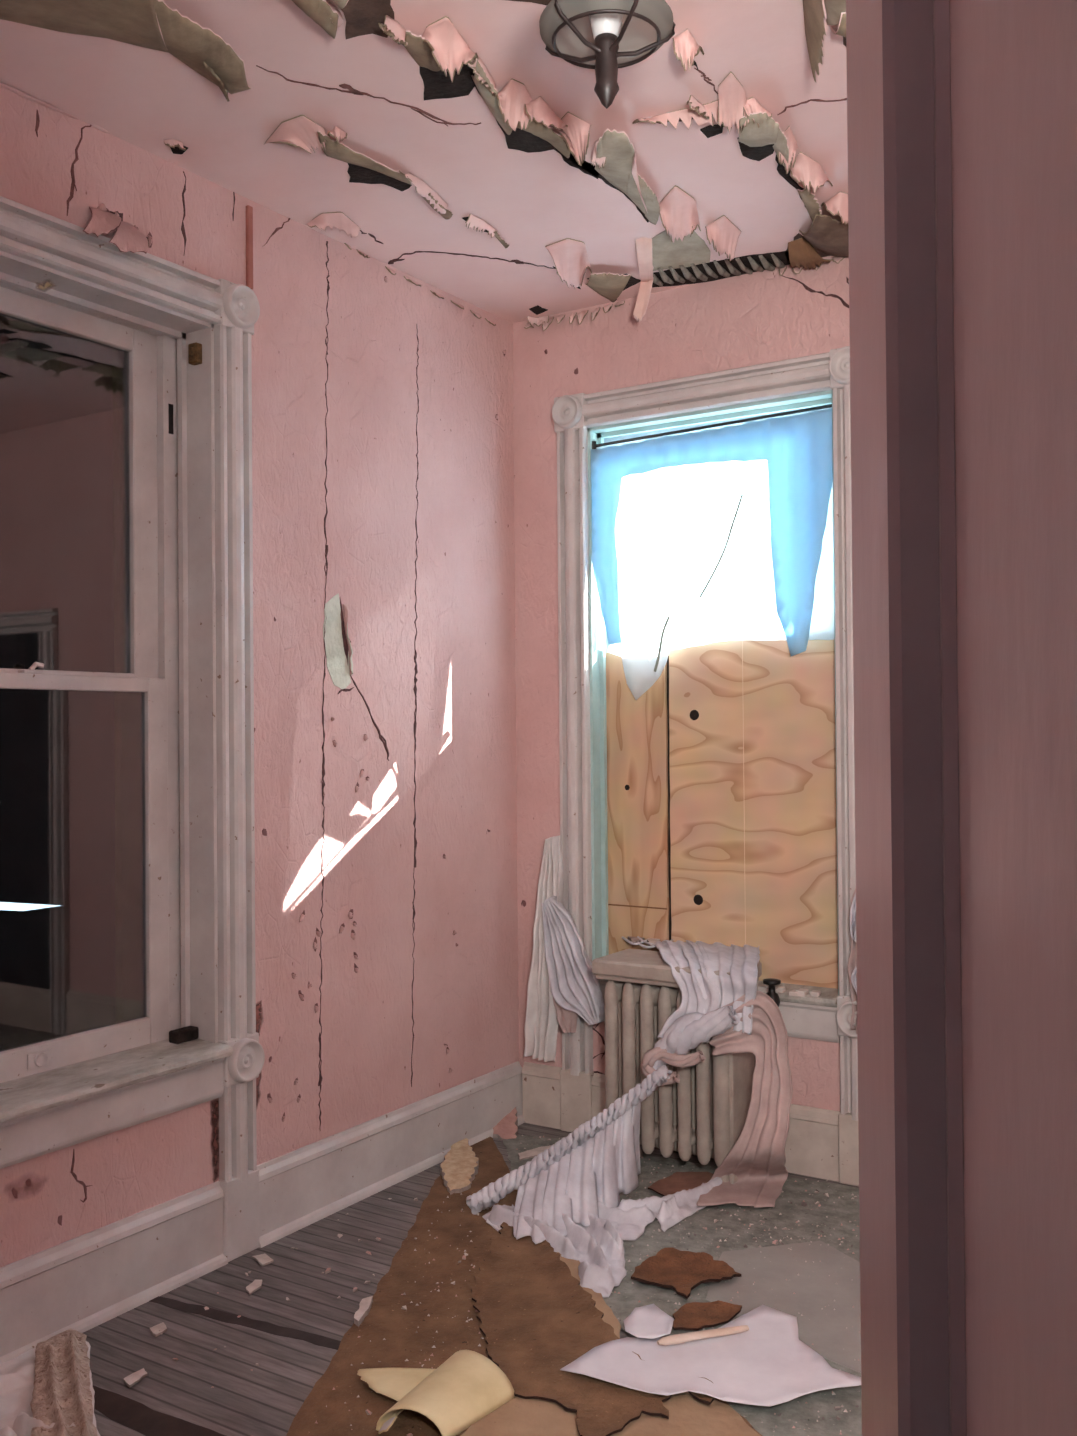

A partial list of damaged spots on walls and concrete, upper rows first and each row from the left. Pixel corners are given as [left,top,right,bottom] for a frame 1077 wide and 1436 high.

crack [33,110,41,137]
crack [67,125,92,216]
spalling [164,139,188,154]
crack [256,65,481,126]
peeling [264,0,849,331]
crack [180,171,188,254]
crack [266,218,291,244]
crack [360,230,555,269]
crack [782,275,849,308]
peeling [323,593,353,689]
crack [318,241,419,1126]
crack [71,1149,93,1203]